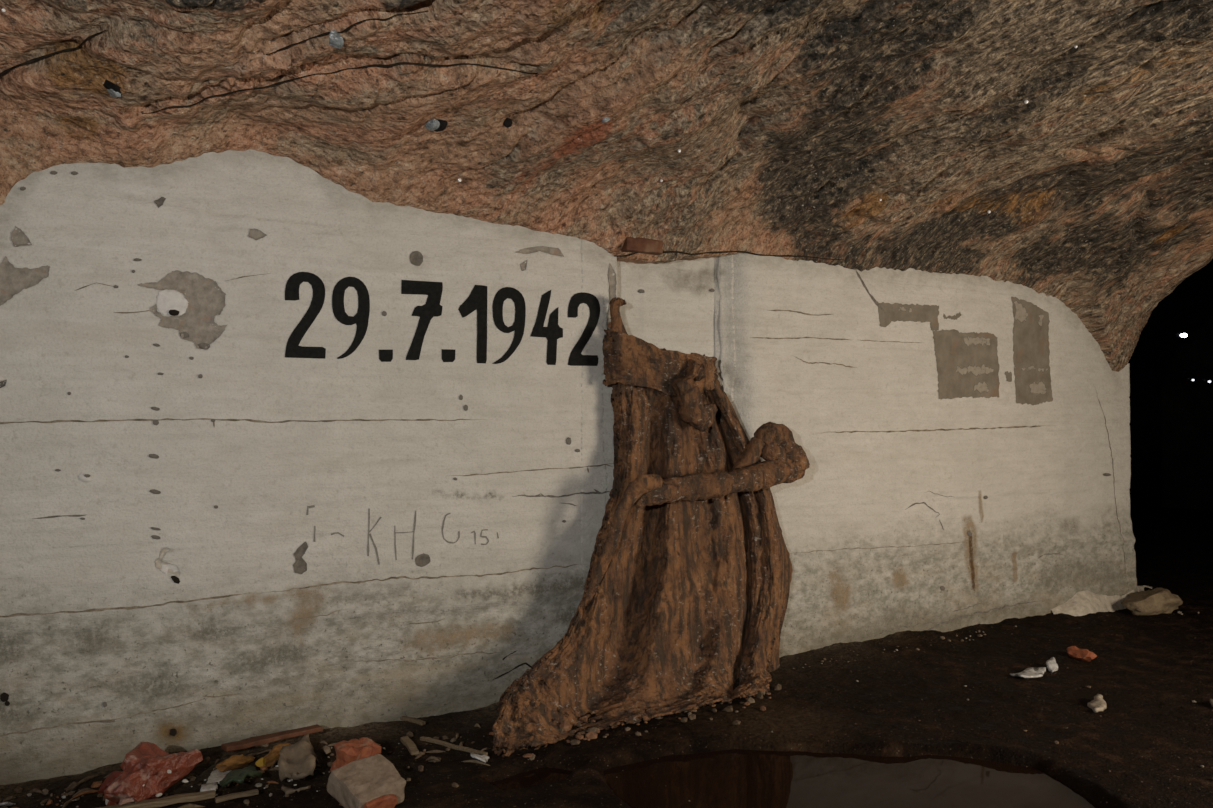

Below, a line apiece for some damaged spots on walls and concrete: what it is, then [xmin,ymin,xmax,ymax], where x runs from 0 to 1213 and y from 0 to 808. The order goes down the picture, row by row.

spalling [0,226,50,305]
spalling [132,258,228,360]